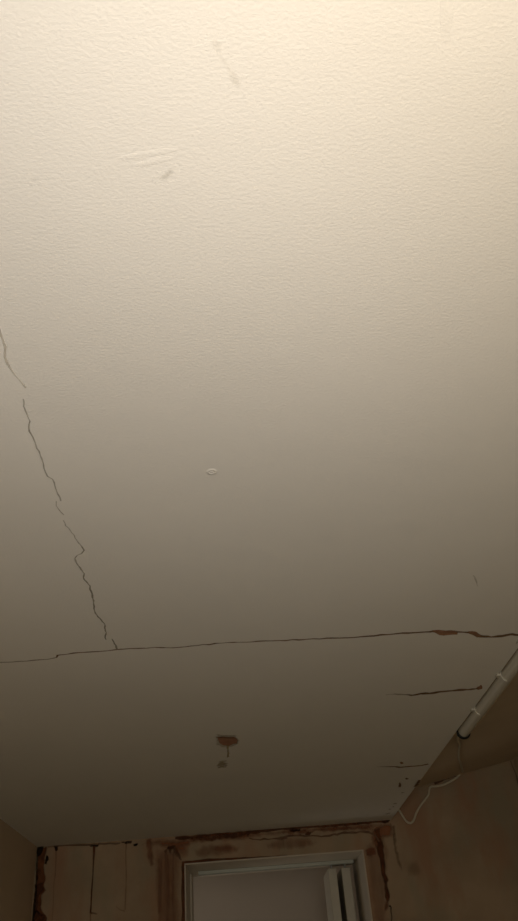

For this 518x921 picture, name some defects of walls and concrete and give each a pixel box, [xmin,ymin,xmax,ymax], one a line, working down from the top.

crack [0,330,26,388]
crack [0,547,518,663]
crack [405,685,482,696]
peeling [217,736,238,757]
flaking render [34,846,49,921]